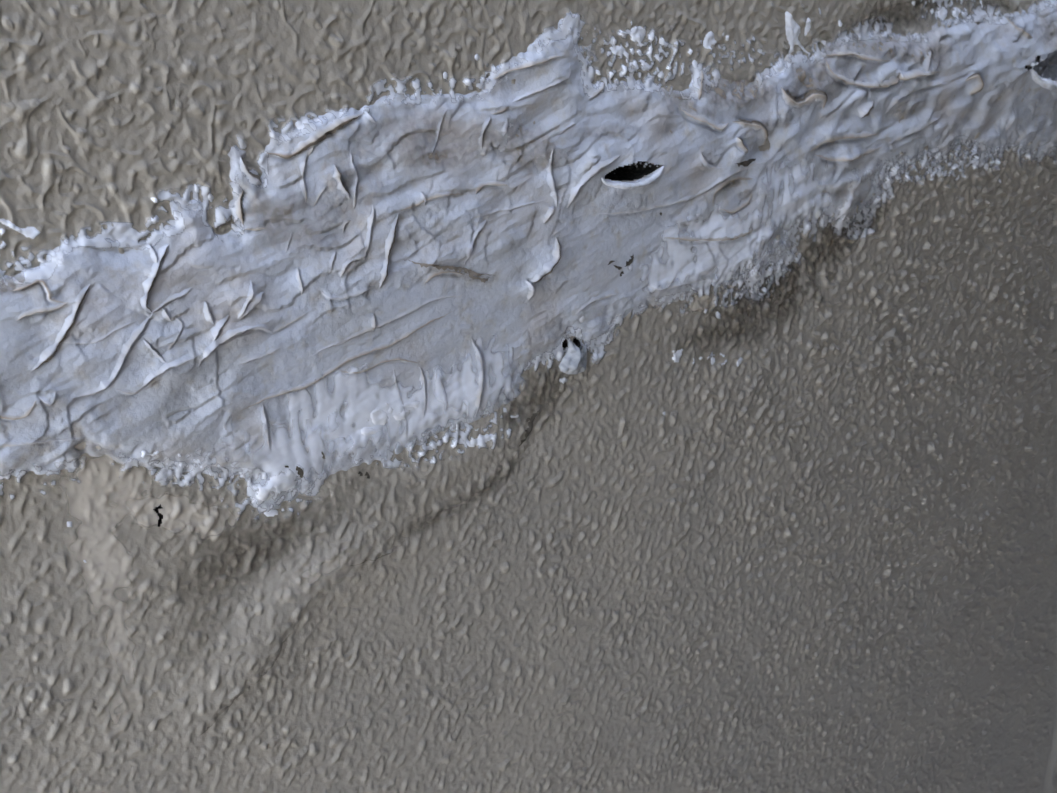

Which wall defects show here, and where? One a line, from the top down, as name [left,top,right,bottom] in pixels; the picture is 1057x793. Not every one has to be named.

peeling [596,21,729,79]
peeling [785,8,821,54]
hole [1025,51,1057,91]
hole [605,161,660,181]
crack [736,158,756,167]
peeling [0,219,40,249]
crack [404,260,489,283]
crack [608,255,634,277]
peeling [410,423,496,464]
crack [285,452,325,478]
peeling [248,465,306,517]
crack [350,410,540,566]